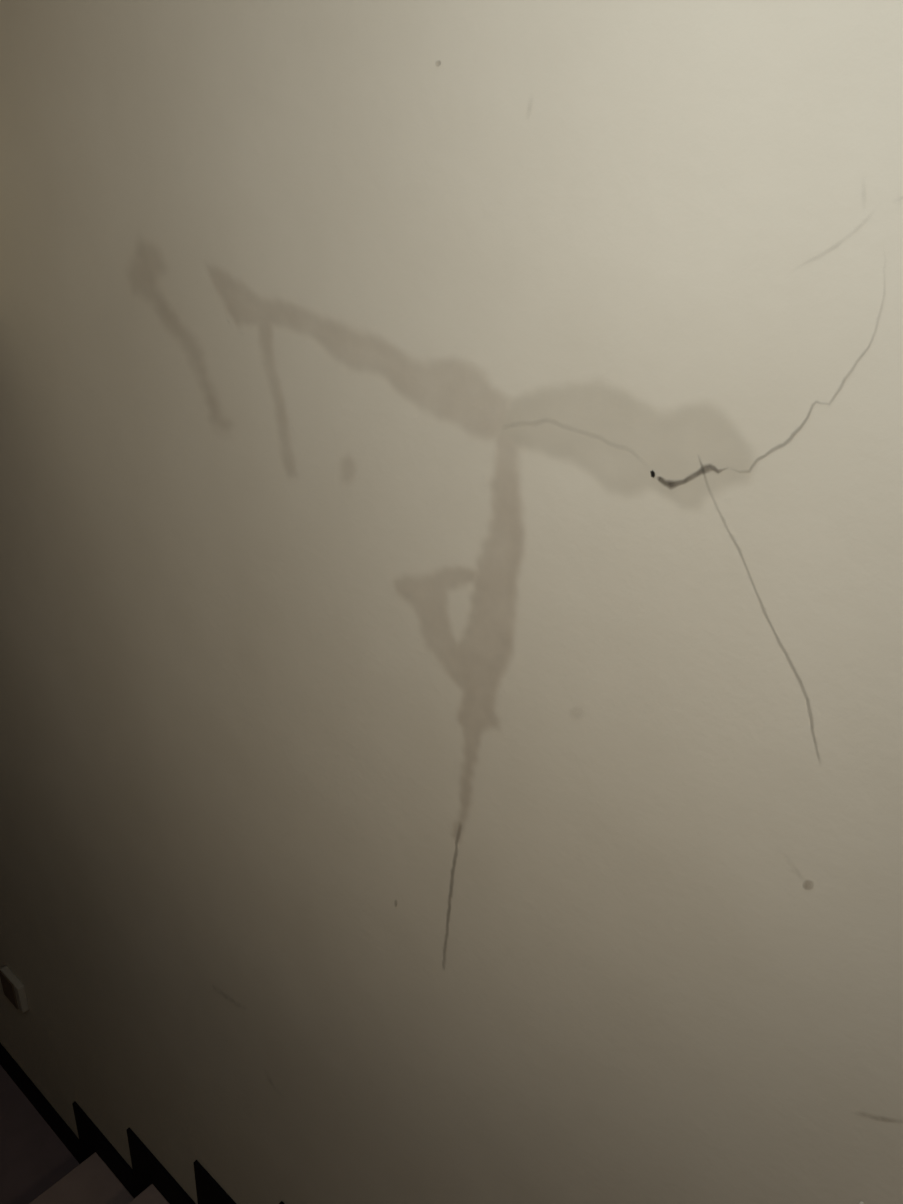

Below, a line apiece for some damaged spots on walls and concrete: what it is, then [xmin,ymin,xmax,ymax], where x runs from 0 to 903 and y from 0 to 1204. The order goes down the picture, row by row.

crack [651,469,703,487]